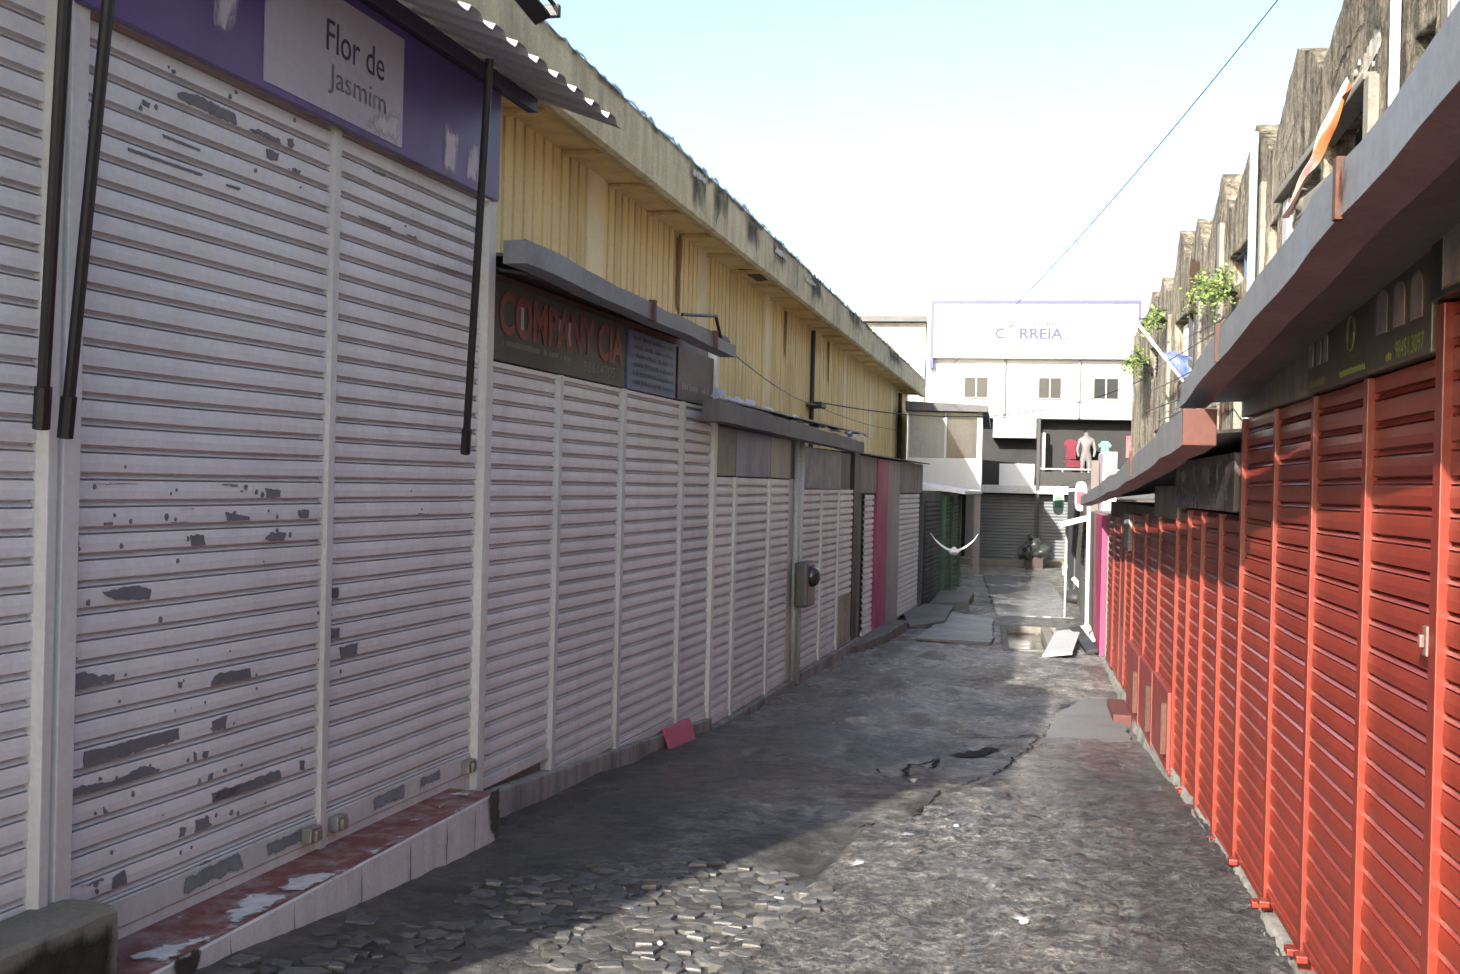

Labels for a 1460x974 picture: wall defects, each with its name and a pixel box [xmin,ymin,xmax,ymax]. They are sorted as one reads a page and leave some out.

peeling [128,147,203,176]
peeling [177,90,301,188]
peeling [164,508,206,546]
peeling [222,484,309,541]
peeling [86,585,152,606]
peeling [317,587,359,673]
peeling [75,657,127,689]
peeling [73,668,258,815]
peeling [178,751,282,855]
spalling [489,788,500,837]
peeling [80,870,127,895]
peeling [131,869,347,974]